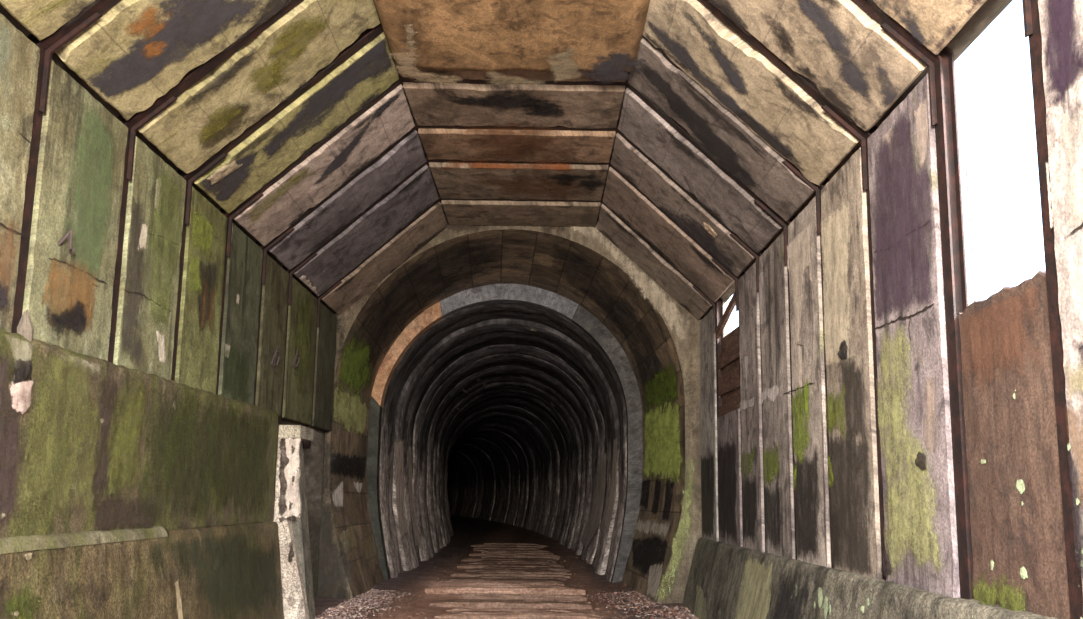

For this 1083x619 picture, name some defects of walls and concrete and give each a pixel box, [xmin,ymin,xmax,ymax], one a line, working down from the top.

leakage [1045,0,1083,104]
crack [0,222,28,237]
corrosion [43,264,95,326]
crack [49,258,170,312]
leakage [0,338,31,525]
leakage [61,355,155,530]
peeling [278,438,301,522]
leakage [175,580,183,619]